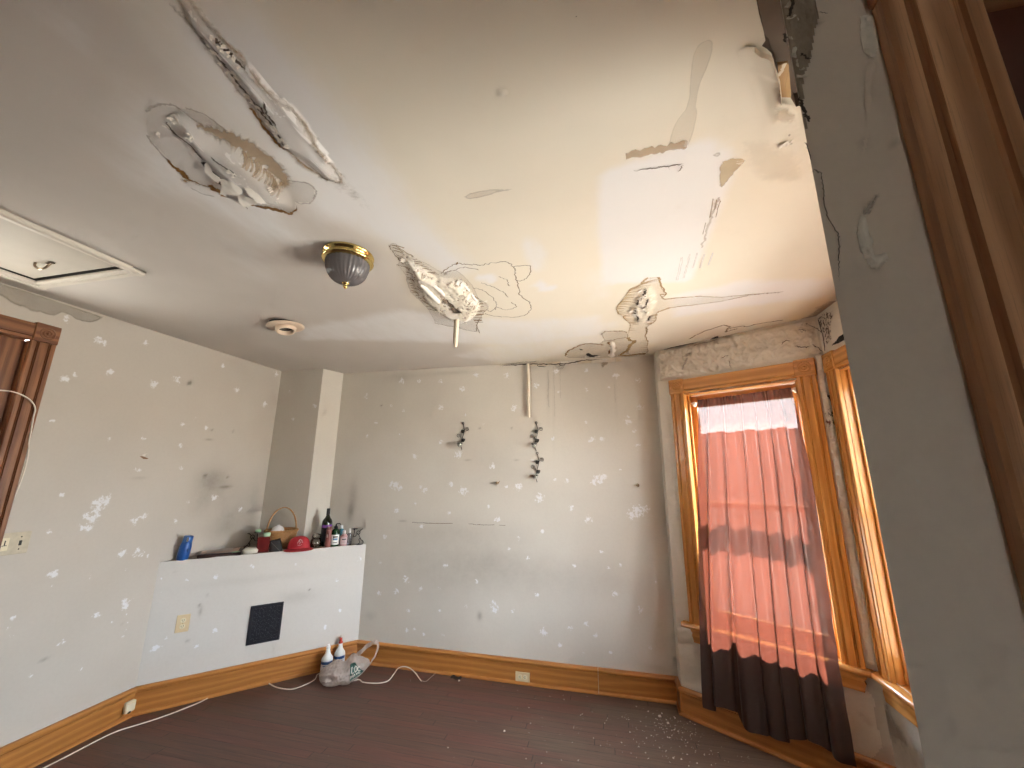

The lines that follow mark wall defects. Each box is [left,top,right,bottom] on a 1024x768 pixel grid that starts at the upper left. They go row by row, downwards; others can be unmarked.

flaking render [781,0,819,129]
crack [806,143,841,270]
peeling [400,256,437,303]
peeling [448,279,487,320]